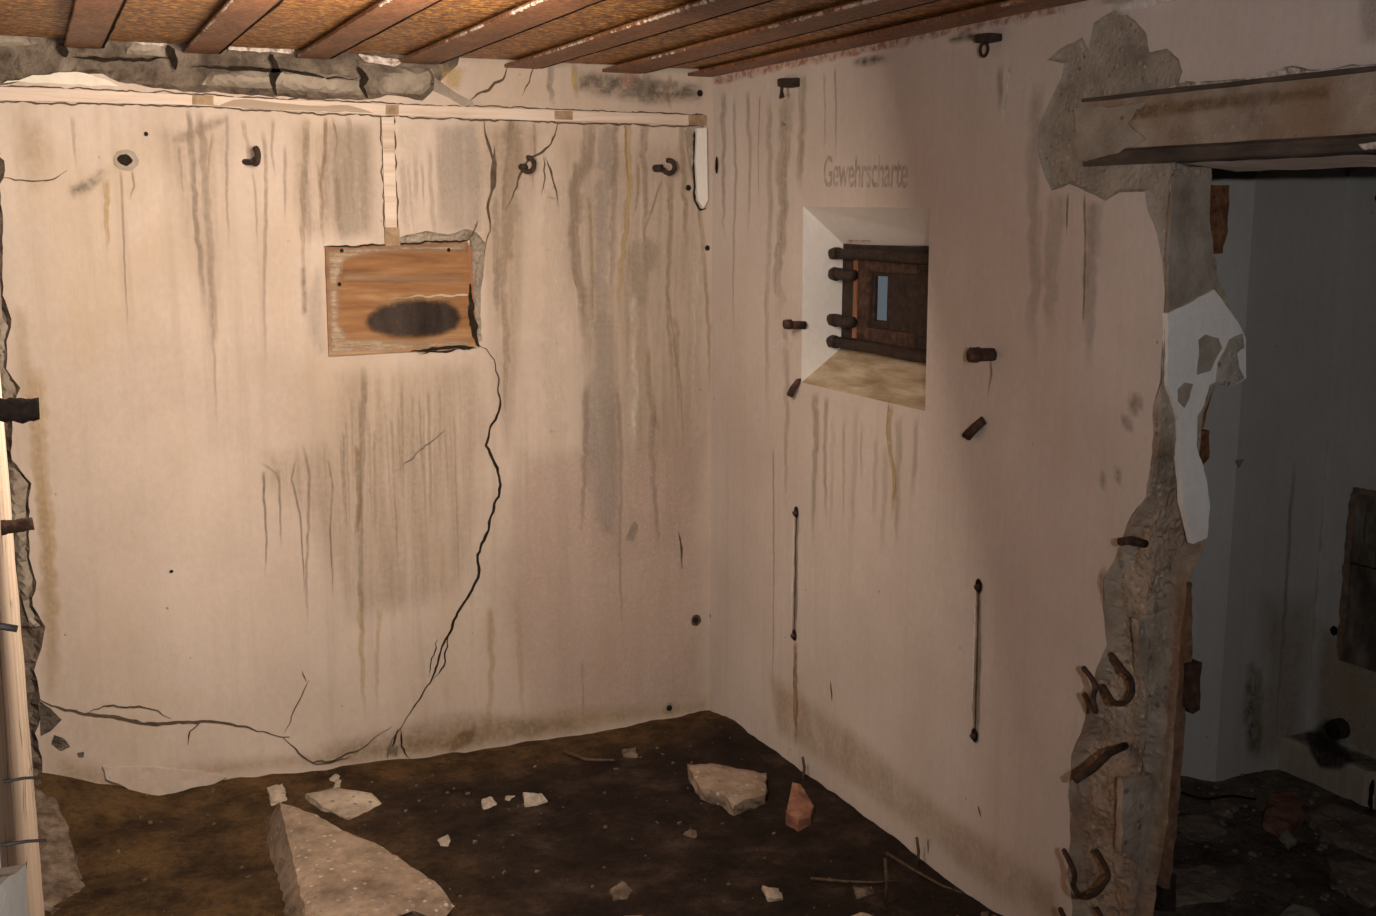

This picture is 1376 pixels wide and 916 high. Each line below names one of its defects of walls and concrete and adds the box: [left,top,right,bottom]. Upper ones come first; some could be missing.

flaking render [0,35,475,107]
crack [2,171,66,182]
spalling [113,150,139,171]
flaking render [0,157,20,399]
flaking render [400,229,485,342]
leakage [629,245,652,439]
spalling [1038,9,1376,916]
flaking render [4,421,84,773]
crack [0,346,502,868]
peeling [102,765,227,796]
peeling [329,772,341,788]